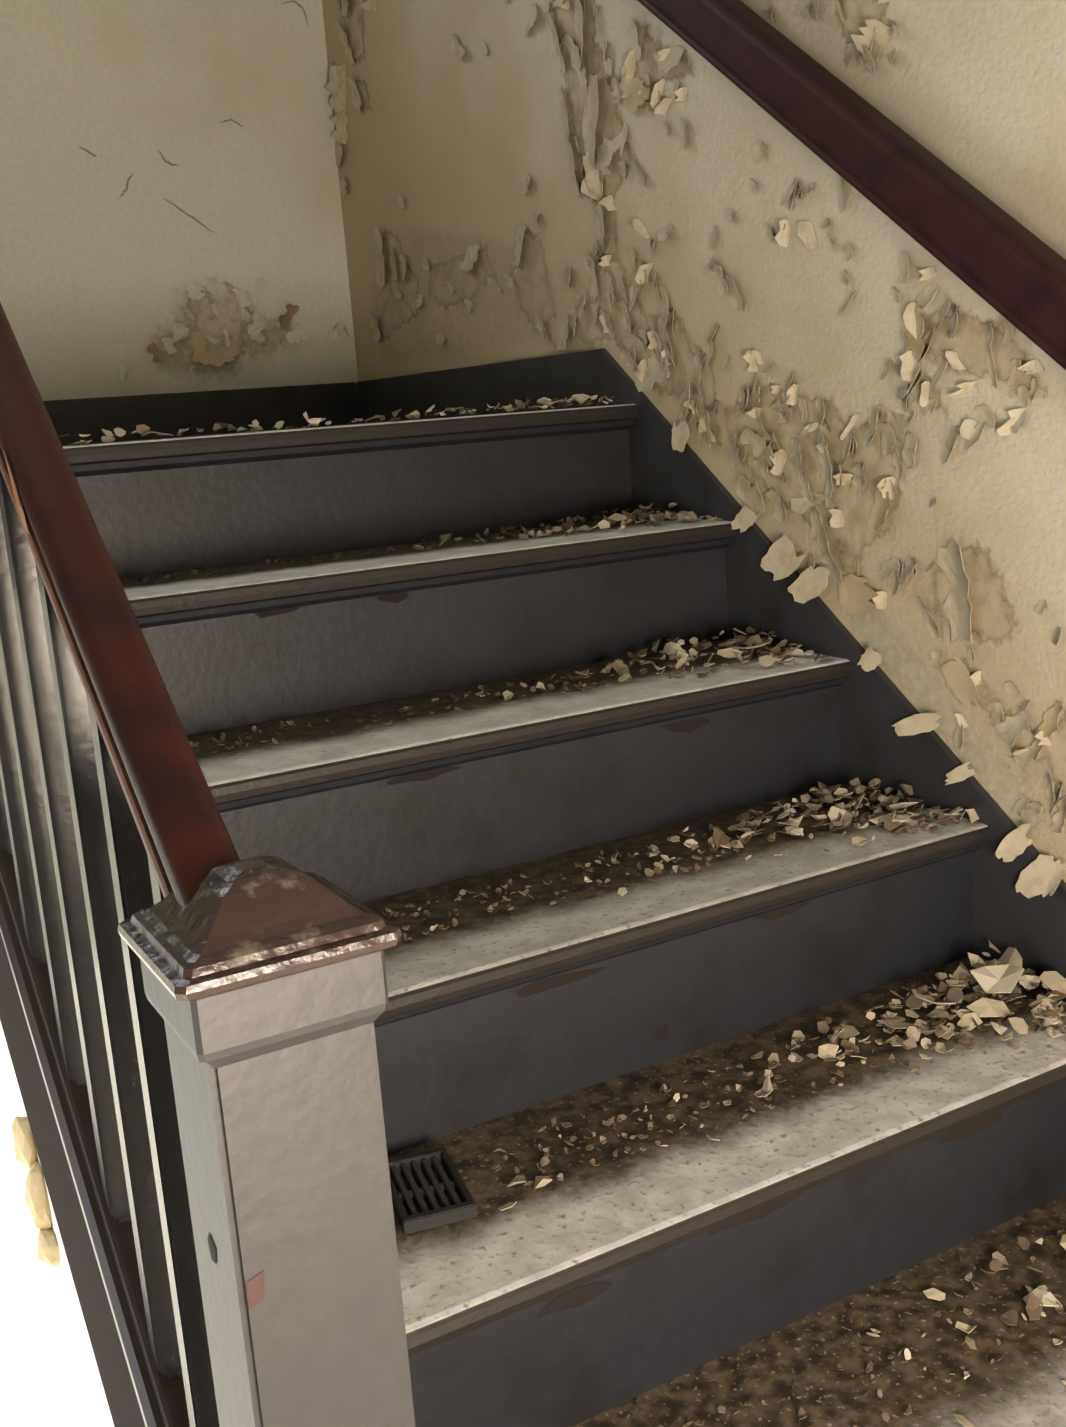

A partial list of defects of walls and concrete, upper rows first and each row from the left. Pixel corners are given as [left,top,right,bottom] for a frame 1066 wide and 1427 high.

peeling [325,0,379,195]
peeling [147,277,306,372]
peeling [365,0,1066,899]